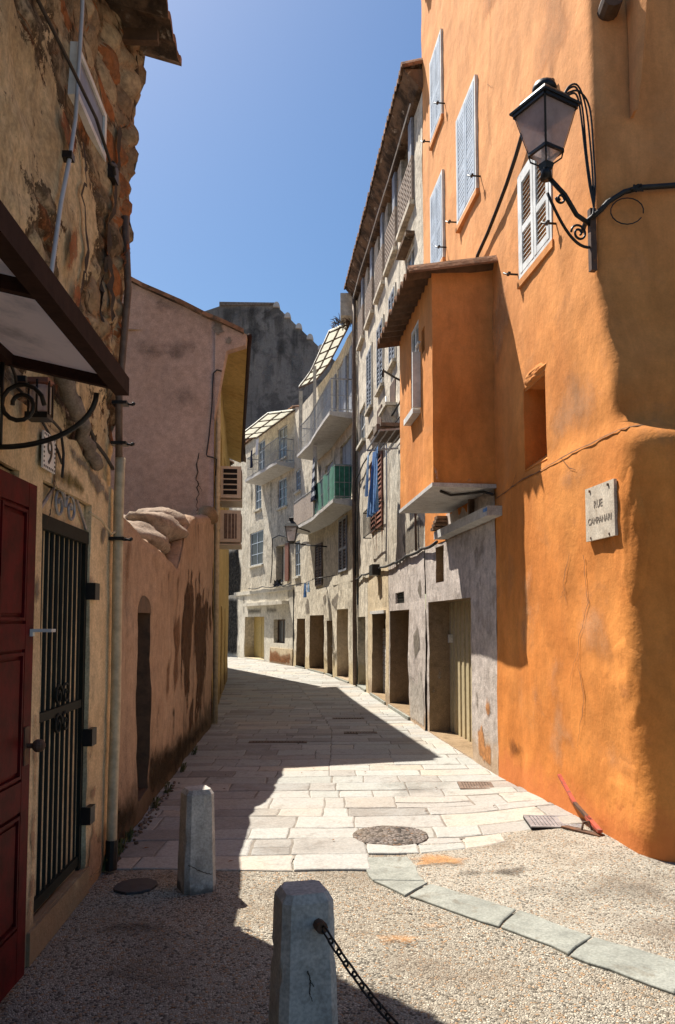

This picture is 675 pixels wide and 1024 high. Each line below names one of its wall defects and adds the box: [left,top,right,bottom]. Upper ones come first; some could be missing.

flaking render [476,693,491,764]
crack [561,556,589,737]